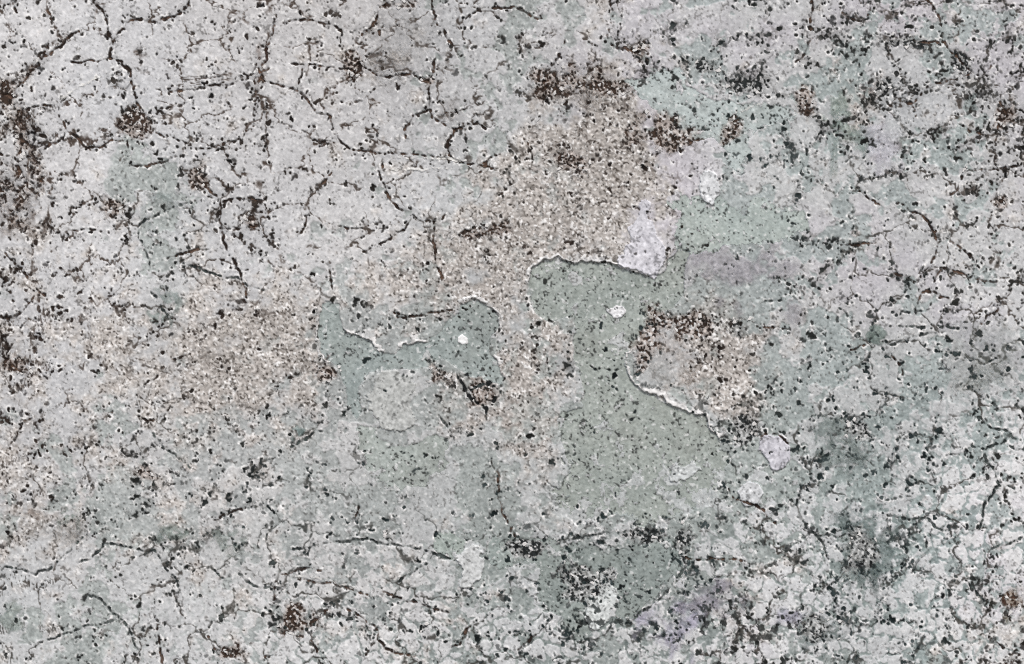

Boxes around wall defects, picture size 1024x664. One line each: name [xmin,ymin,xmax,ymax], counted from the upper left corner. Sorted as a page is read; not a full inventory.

crack [889,0,992,122]
crack [0,0,543,279]
crack [137,185,264,298]
crack [839,190,999,375]
peeling [315,294,504,490]
crack [457,373,502,420]
peeling [451,170,810,644]
crack [1,537,179,587]
crack [38,594,164,664]
crack [210,505,474,664]
crack [885,496,946,573]
crack [946,416,1024,550]